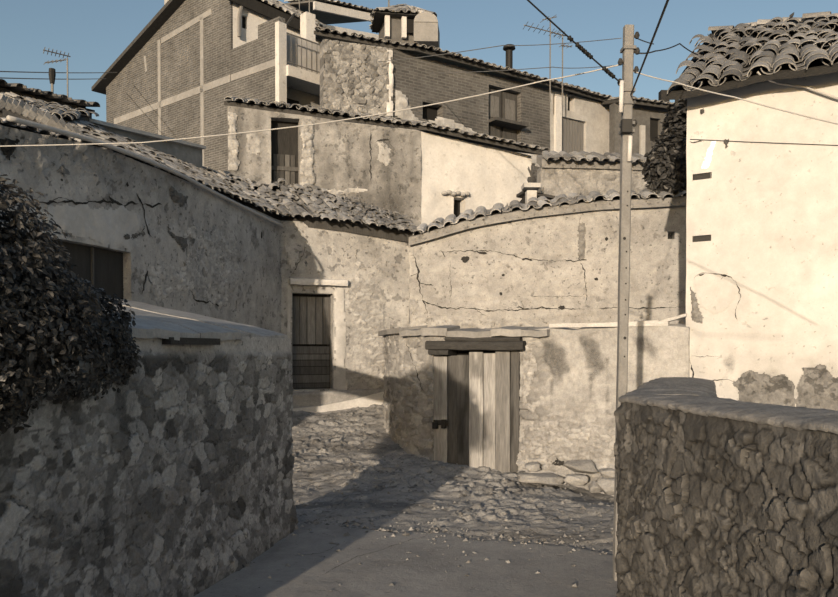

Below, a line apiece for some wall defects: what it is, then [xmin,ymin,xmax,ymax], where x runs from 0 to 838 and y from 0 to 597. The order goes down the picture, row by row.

spalling [377,142,391,166]
spalling [326,187,367,196]
crack [411,248,676,320]
spalling [690,287,704,323]
spalling [732,364,838,411]